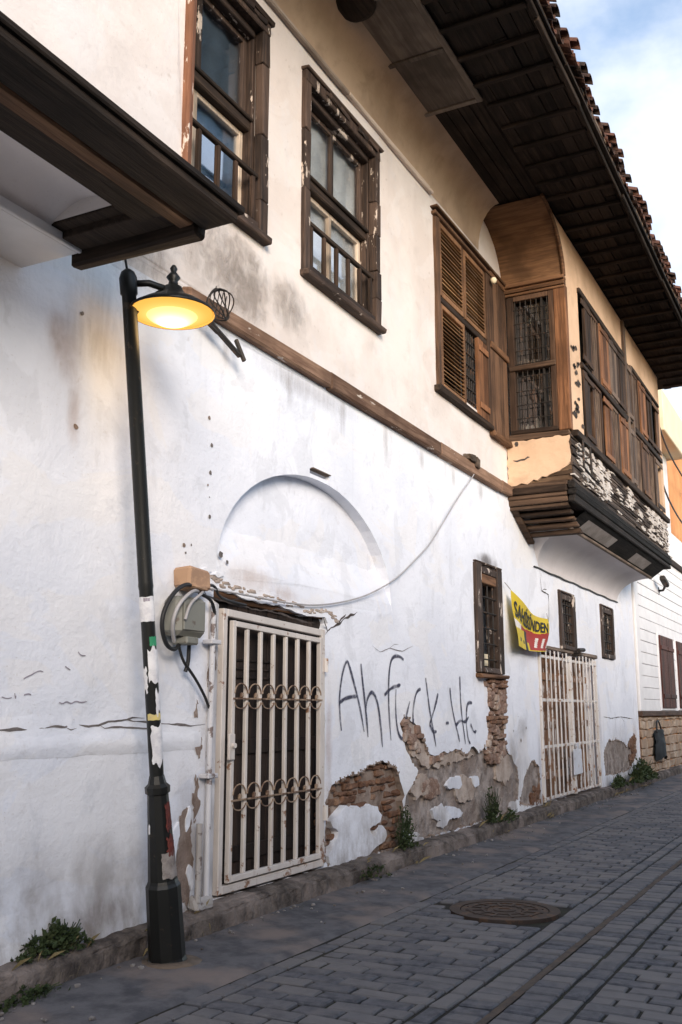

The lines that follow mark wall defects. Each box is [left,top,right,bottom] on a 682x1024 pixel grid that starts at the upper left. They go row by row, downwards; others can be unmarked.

flaking render [570,443,670,553]
spalling [202,551,339,623]
crack [0,717,203,732]
peeling [194,700,202,759]
spalling [313,678,541,867]
spalling [604,733,637,776]
peeling [172,774,201,906]